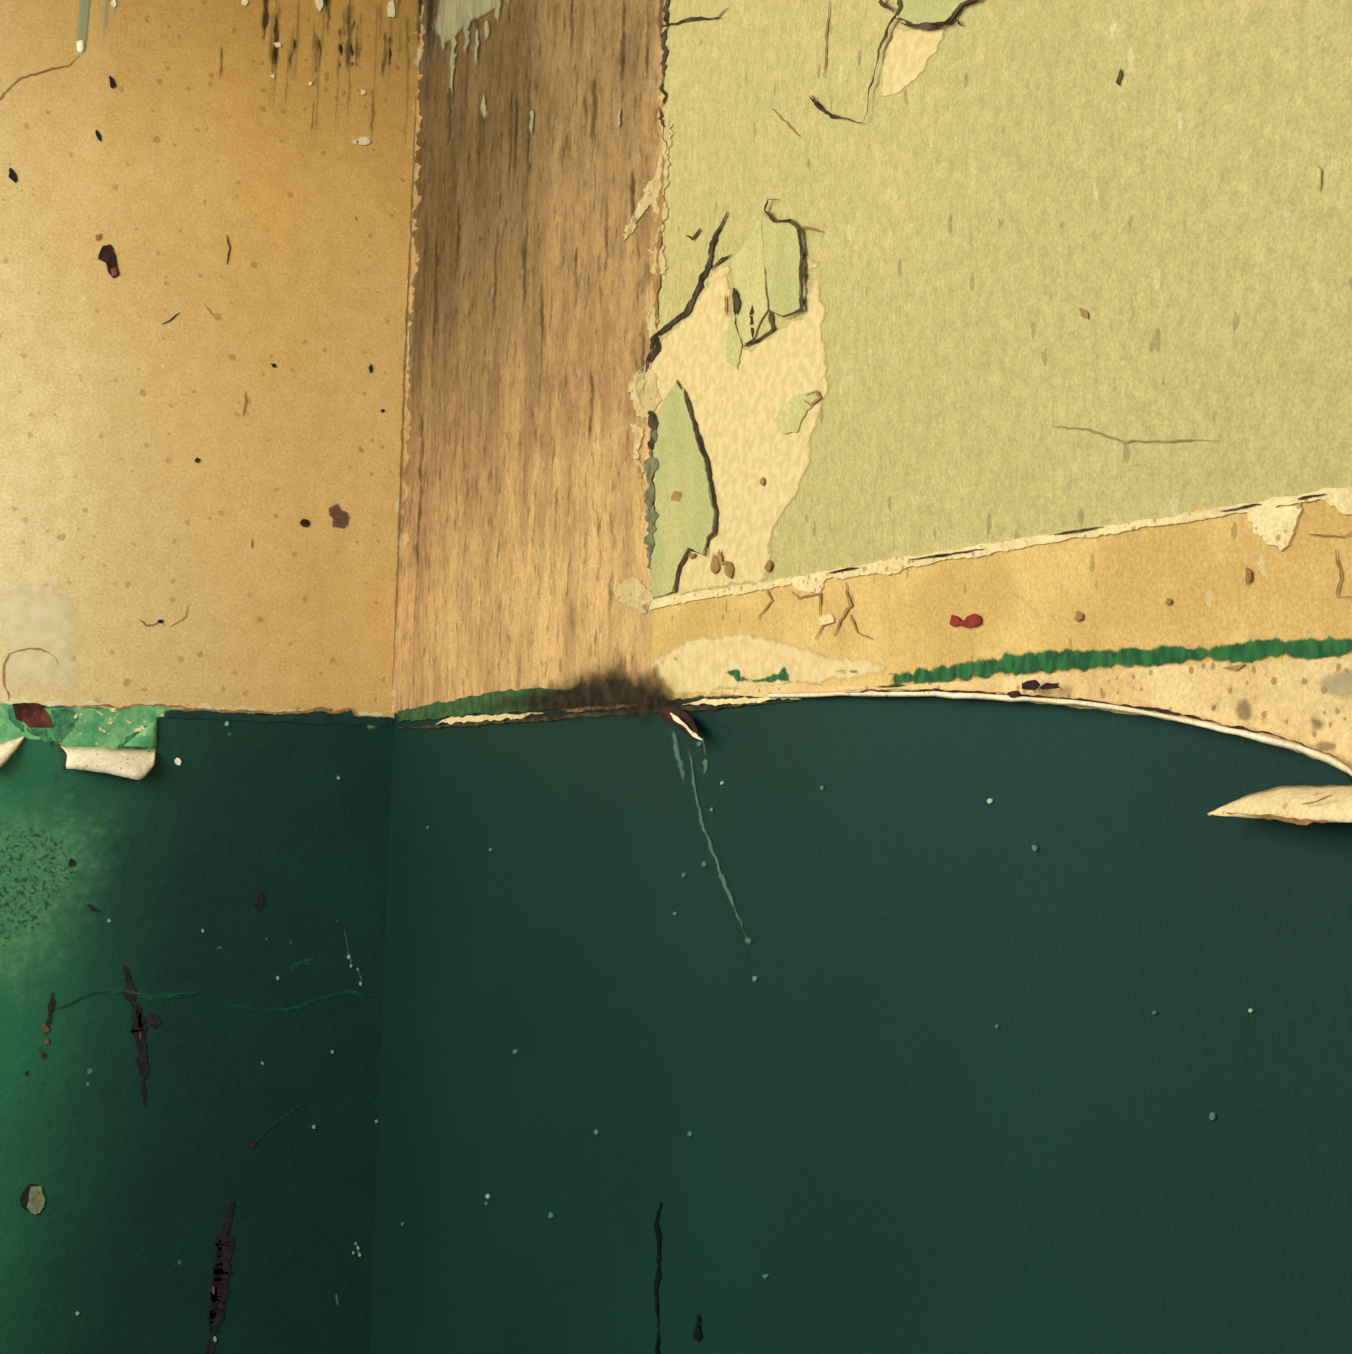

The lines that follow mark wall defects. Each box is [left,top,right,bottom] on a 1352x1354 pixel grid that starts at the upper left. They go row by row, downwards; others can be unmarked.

leakage [417,0,434,33]
peeling [613,0,1352,613]
peeling [818,614,835,626]
leakage [498,665,675,717]
peeling [0,634,1352,825]
leakage [0,823,75,946]
spalling [41,992,55,1059]
crack [653,1202,661,1354]